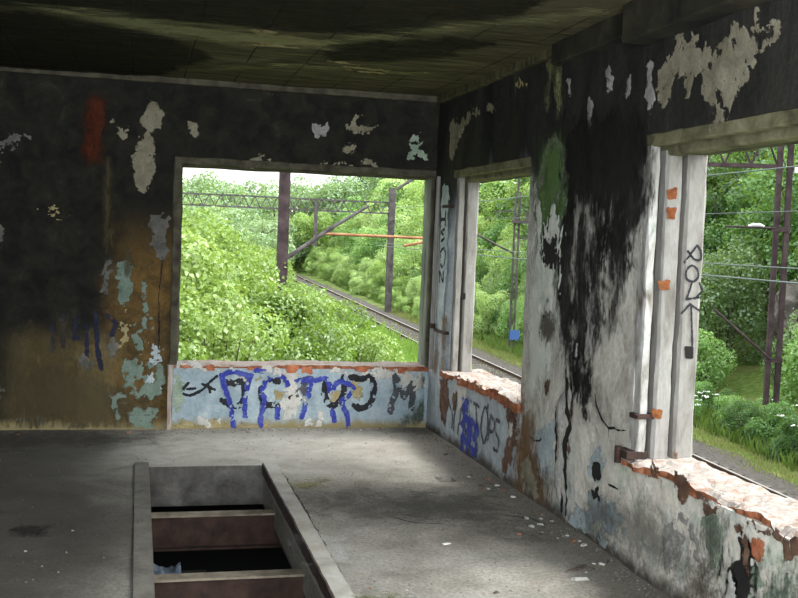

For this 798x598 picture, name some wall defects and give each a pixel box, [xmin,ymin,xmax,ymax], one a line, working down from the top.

damp [22,3,415,51]
damp [547,60,562,110]
peeling [644,6,781,134]
peeling [131,100,165,194]
peeling [320,114,378,167]
peeling [407,132,429,161]
damp [526,136,632,416]
peeling [99,259,324,429]
spalling [328,365,426,401]
peeling [439,375,556,499]
peeling [645,462,727,575]
flaking render [734,517,798,598]